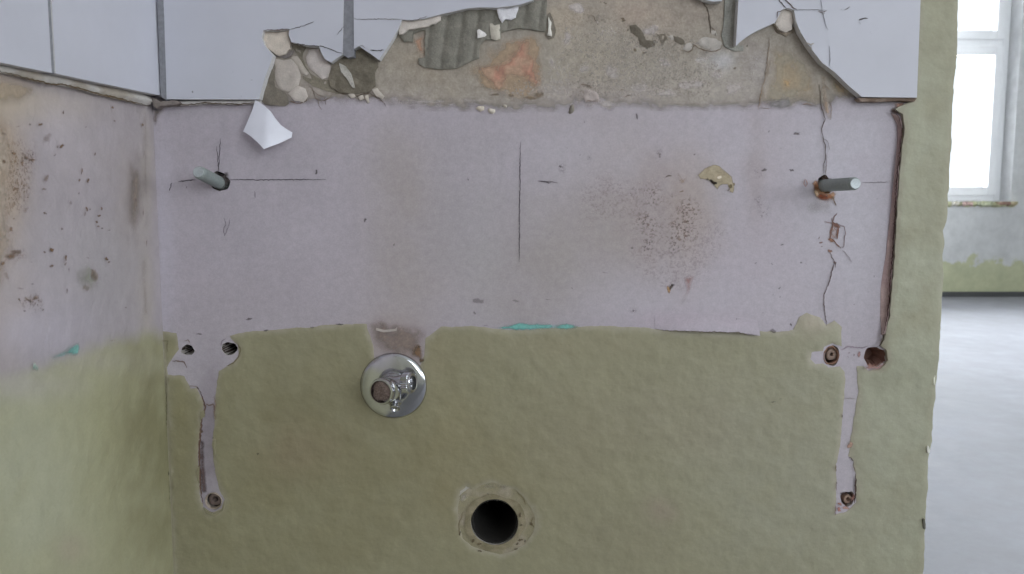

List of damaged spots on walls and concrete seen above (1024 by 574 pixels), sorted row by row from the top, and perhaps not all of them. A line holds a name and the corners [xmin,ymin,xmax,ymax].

crack [819,85,832,177]
rust [804,176,836,205]
peeling [152,0,906,517]
crack [818,214,852,325]